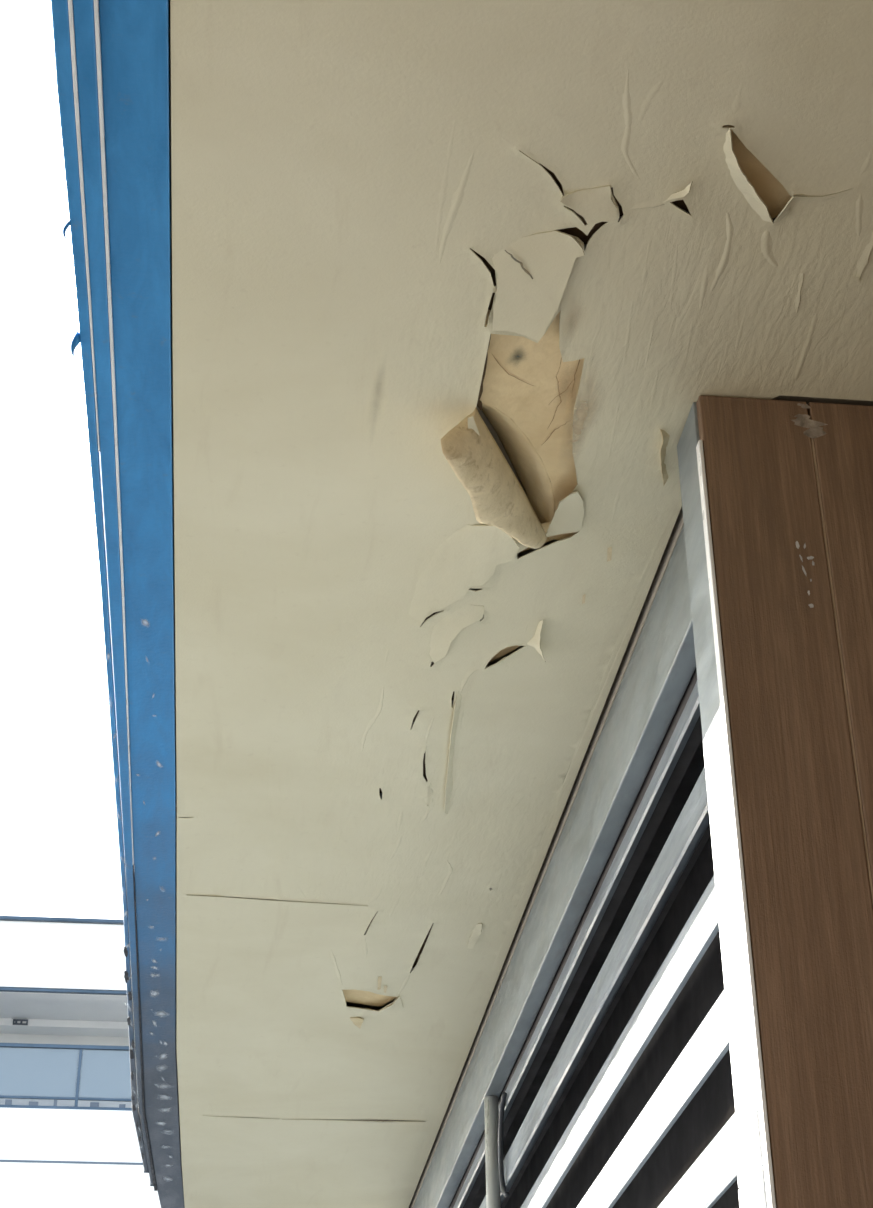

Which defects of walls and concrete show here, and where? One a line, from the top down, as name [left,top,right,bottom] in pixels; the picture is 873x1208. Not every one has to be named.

peeling [723,81,846,267]
peeling [409,230,585,623]
peeling [660,429,670,485]
peeling [460,620,546,694]
peeling [330,948,410,1028]